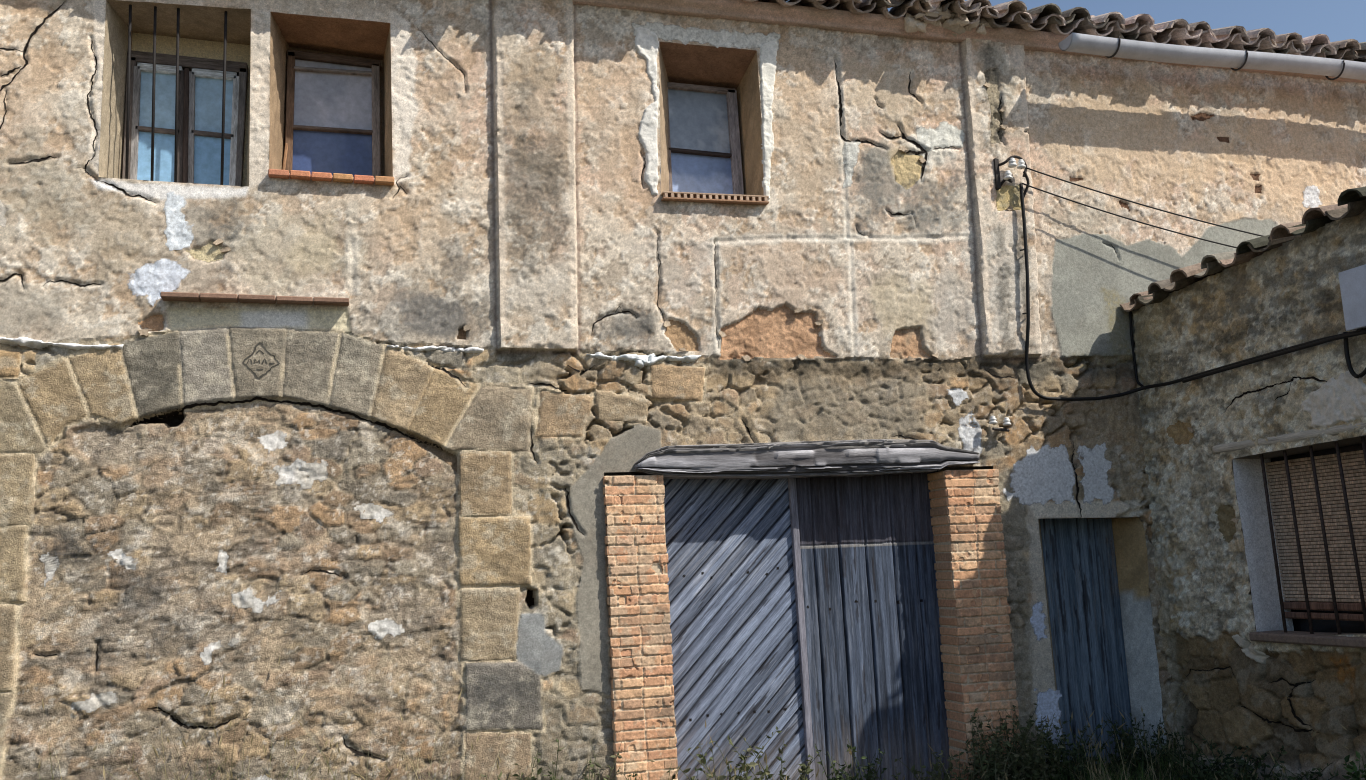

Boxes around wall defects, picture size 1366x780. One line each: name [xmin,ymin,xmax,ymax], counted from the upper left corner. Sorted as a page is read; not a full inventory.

crack [0,2,64,129]
crack [9,39,155,203]
crack [835,63,955,180]
crack [856,209,917,236]
crack [0,273,101,287]
spalling [663,320,699,352]
spalling [718,304,836,361]
spalling [890,327,938,361]
crack [1226,376,1327,410]